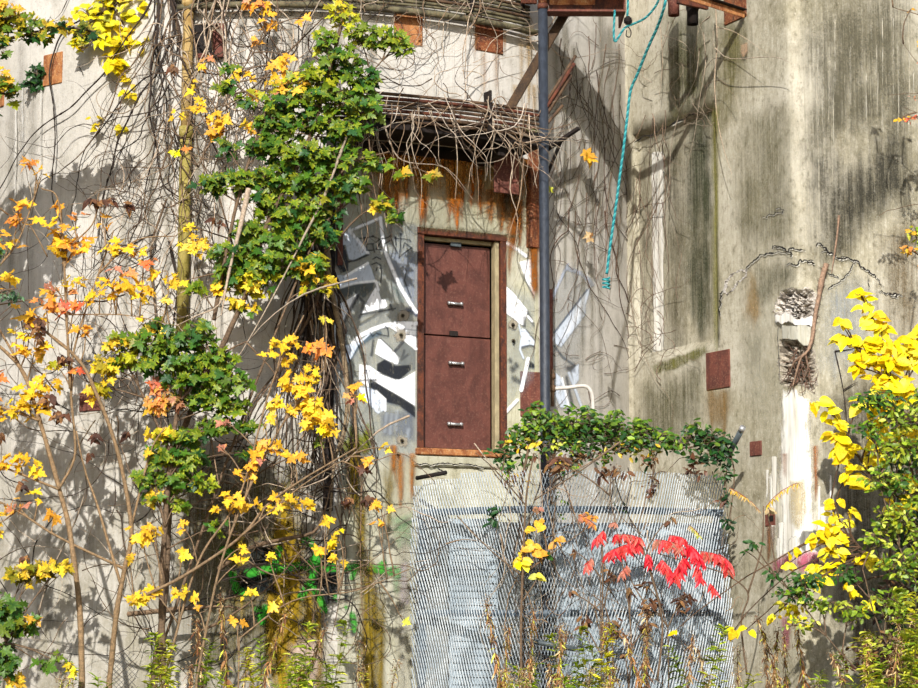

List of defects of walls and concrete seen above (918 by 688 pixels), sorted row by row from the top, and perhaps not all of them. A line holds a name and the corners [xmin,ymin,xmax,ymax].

damp [669,20,706,114]
damp [809,0,914,257]
rust [371,153,522,266]
rust [530,247,538,294]
damp [640,108,718,352]
crack [746,243,901,299]
spalling [772,287,818,394]
rust [391,445,415,501]